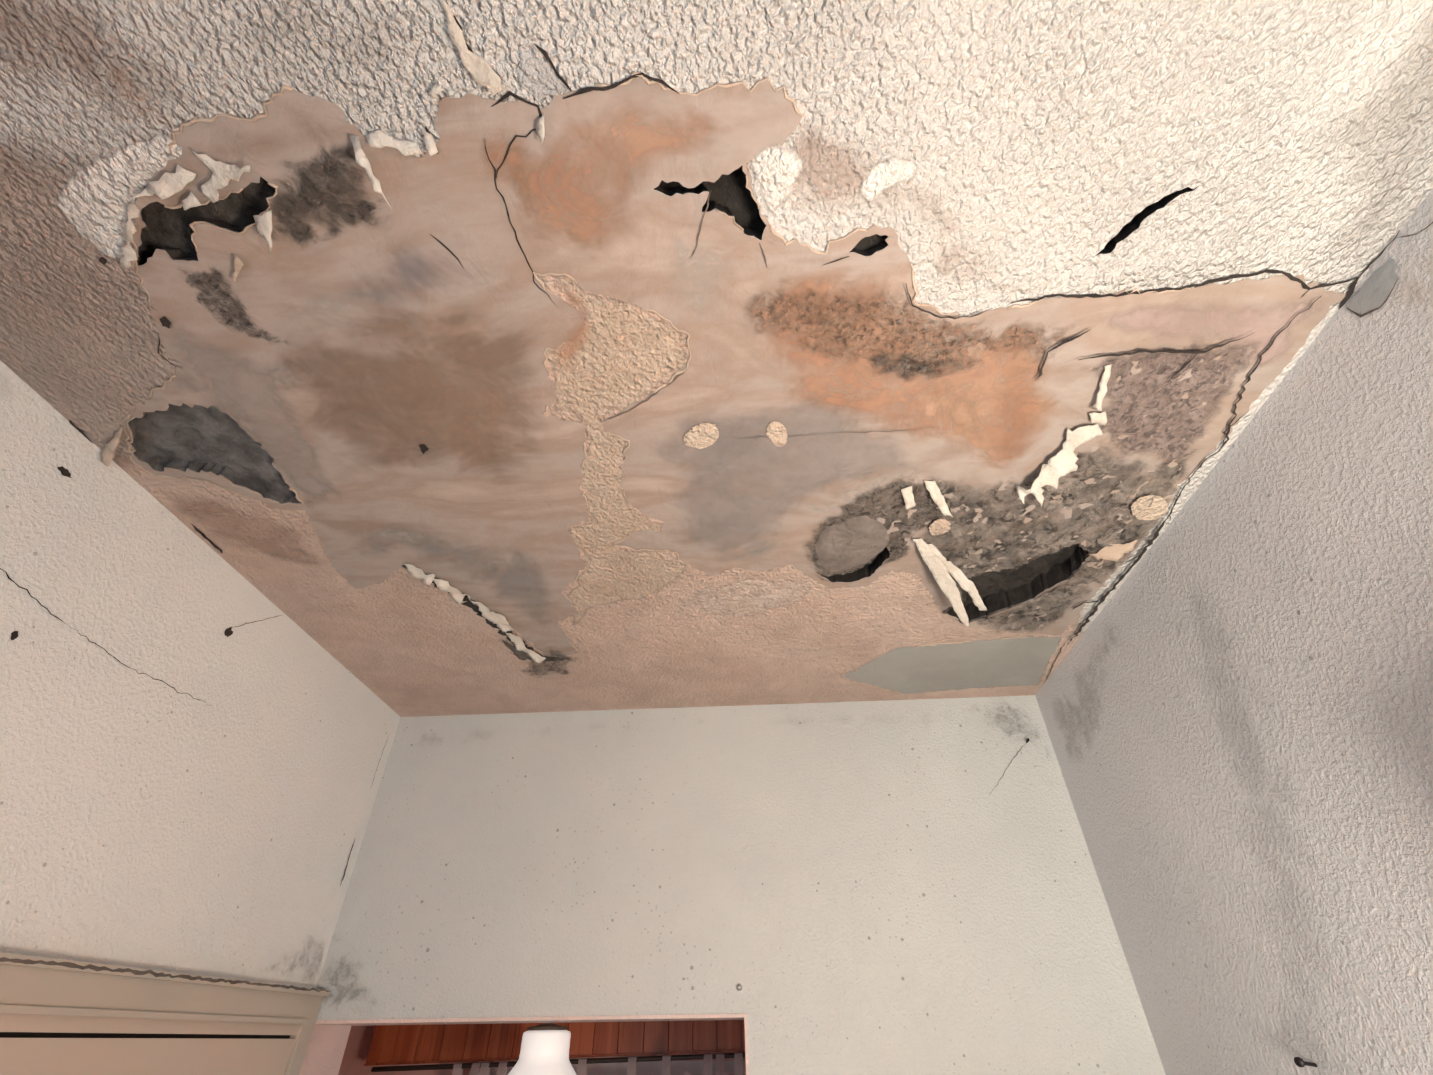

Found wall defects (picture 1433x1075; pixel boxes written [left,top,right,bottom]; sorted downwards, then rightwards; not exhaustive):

crack [0,568,211,706]
water stain [0,148,1082,717]
water stain [488,112,707,242]
peeling [69,0,1399,694]
crack [1097,187,1197,255]
crack [906,230,1400,683]